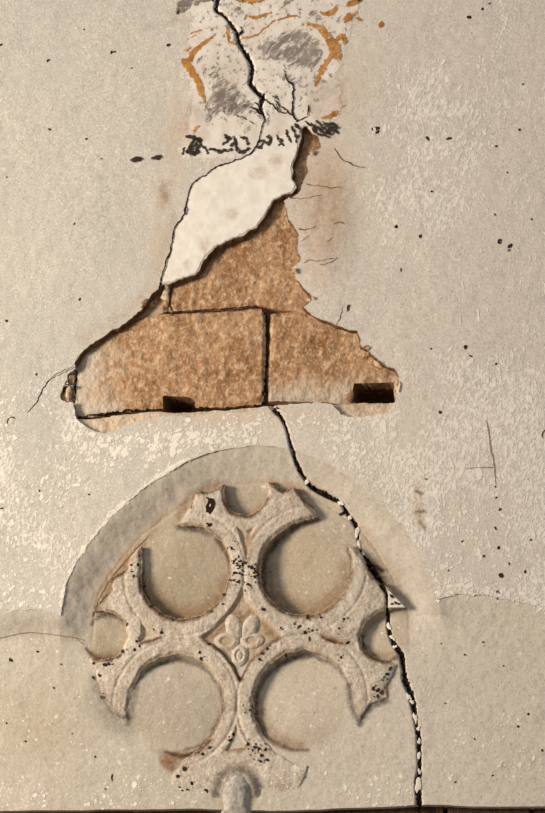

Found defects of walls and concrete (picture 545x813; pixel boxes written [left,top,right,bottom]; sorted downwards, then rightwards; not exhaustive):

crack [158,0,310,288]
crack [28,357,79,412]
spalling [0,125,545,614]
crack [262,402,422,813]